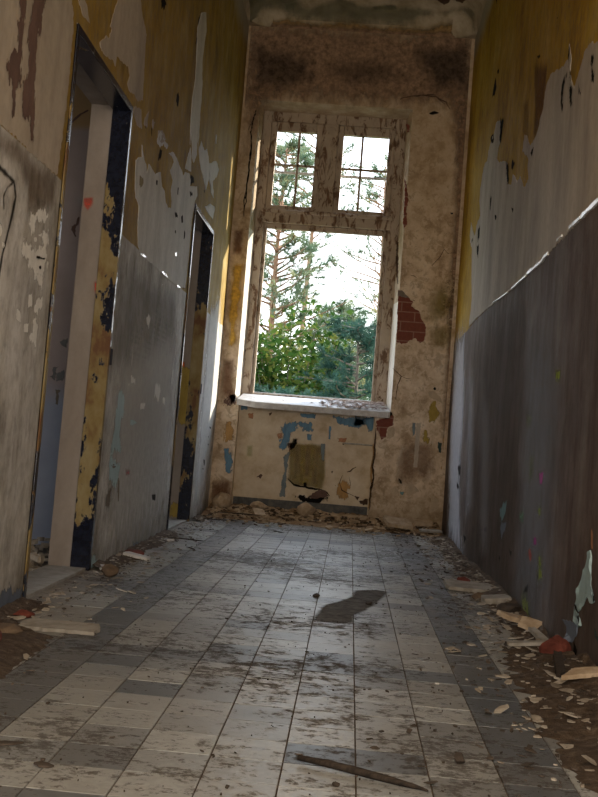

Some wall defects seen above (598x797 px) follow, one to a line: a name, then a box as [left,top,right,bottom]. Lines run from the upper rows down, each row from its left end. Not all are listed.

crack [0,166,17,272]
peeling [0,0,90,175]
peeling [99,0,219,288]
leakage [245,0,470,547]
flaking render [396,242,426,344]
peeling [469,41,598,327]
peeling [277,413,316,497]
flaking render [295,480,368,505]
peeling [321,412,395,461]
peeling [445,592,598,738]
peeling [562,529,595,669]